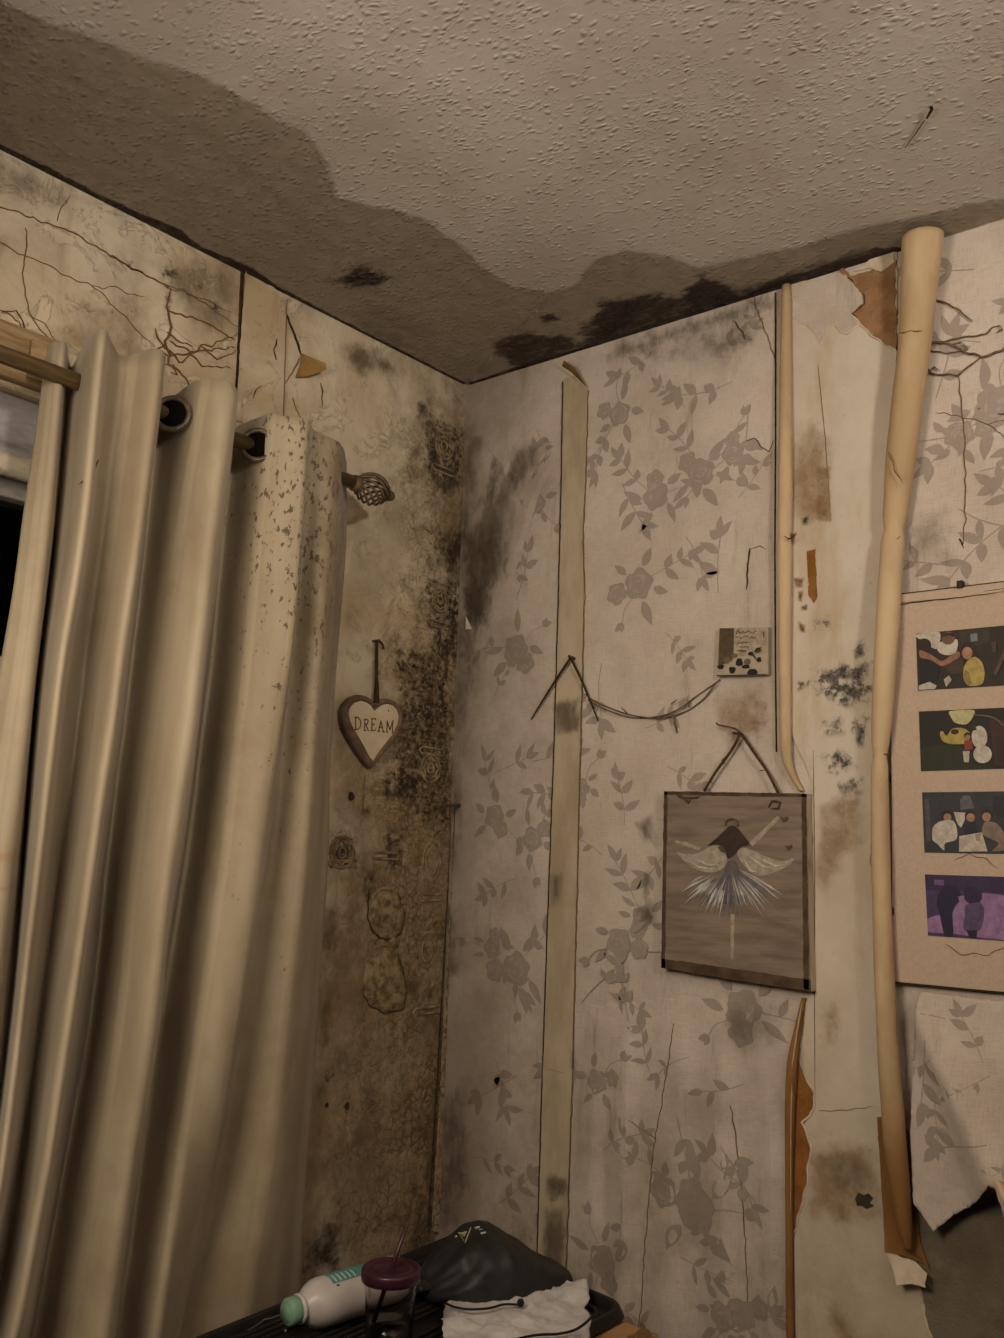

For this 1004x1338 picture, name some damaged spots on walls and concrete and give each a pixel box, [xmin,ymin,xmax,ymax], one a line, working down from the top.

water stain [0,4,1004,384]
crack [0,195,238,346]
peeling [235,271,326,423]
water stain [420,405,467,490]
water stain [384,492,505,824]
water stain [821,644,872,705]
water stain [833,753,856,792]
peeling [791,252,1004,1338]
water stain [307,1226,338,1268]